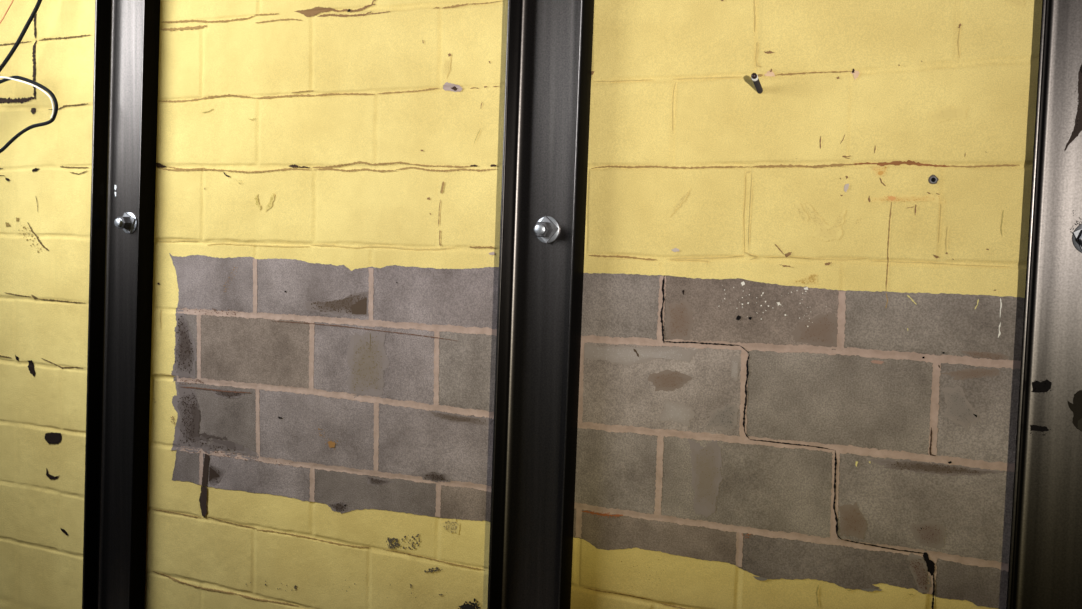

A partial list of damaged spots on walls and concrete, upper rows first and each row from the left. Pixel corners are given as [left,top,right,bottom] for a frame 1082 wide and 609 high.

peeling [169,252,499,522]
damp [386,534,420,550]
mould [458,598,481,609]
peeling [573,273,1025,609]
crack [586,160,1017,609]